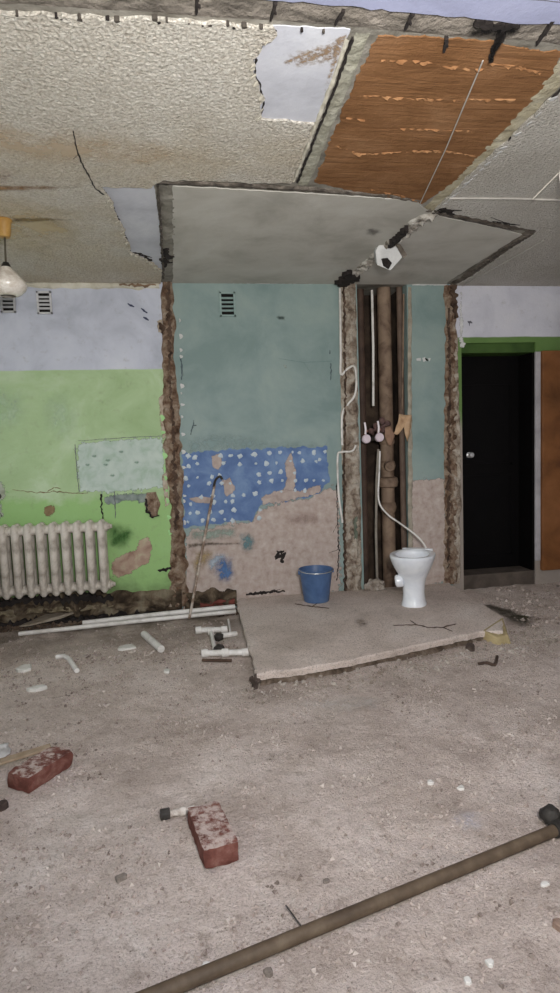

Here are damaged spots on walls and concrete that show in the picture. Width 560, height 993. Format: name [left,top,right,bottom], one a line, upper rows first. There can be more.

crack [194,0,202,15]
crack [254,1,278,115]
peeling [249,23,350,122]
crack [335,9,345,26]
crack [404,13,415,31]
crack [442,35,450,53]
crack [536,0,559,46]
peeling [26,185,174,290]
crack [73,131,152,261]
flaking render [75,394,172,535]
flaking render [0,484,343,628]
crack [393,620,456,631]